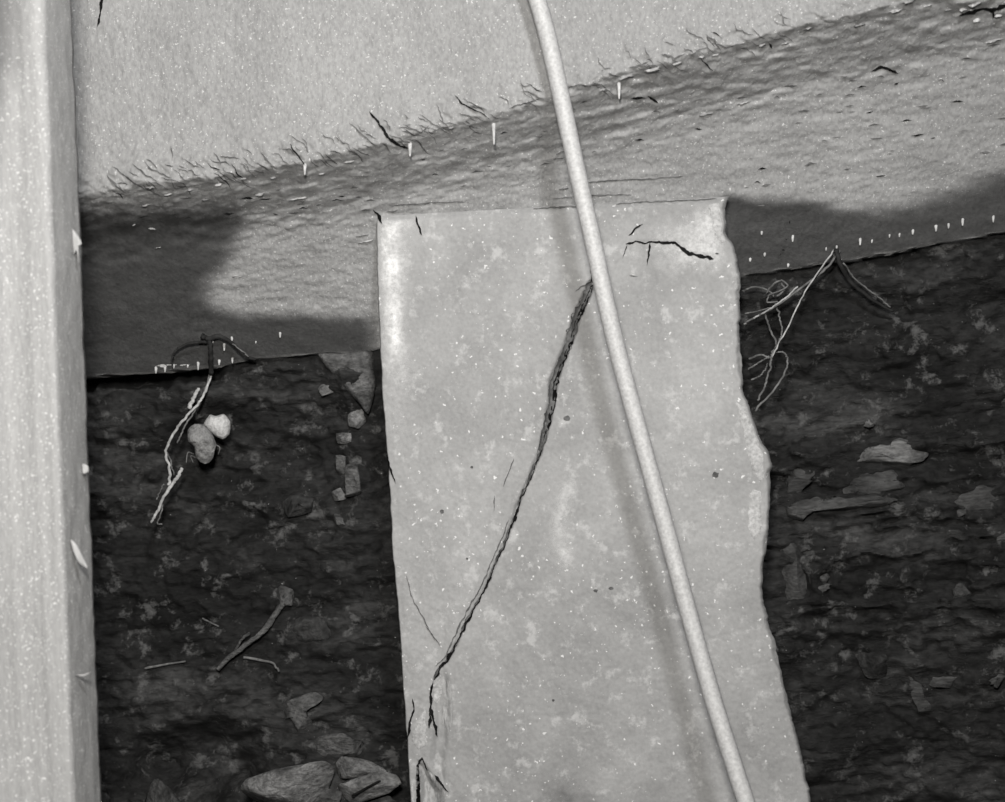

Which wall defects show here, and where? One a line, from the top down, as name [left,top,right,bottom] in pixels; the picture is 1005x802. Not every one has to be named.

crack [533,176,719,277]
crack [406,272,593,802]